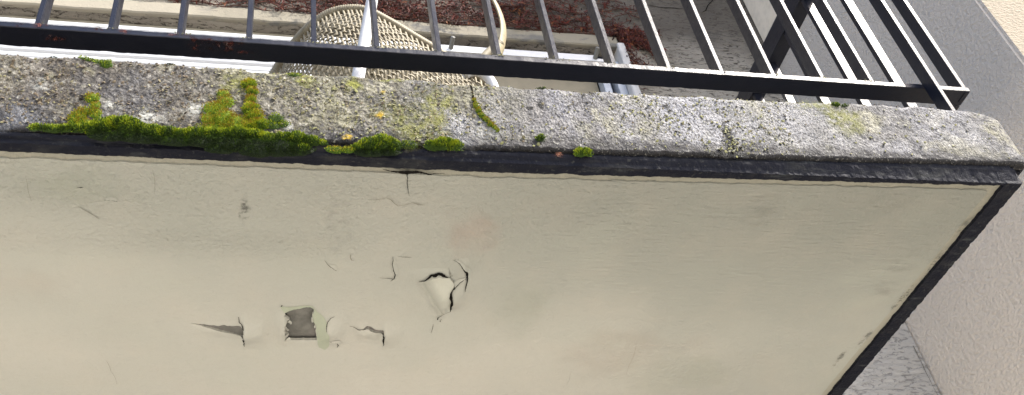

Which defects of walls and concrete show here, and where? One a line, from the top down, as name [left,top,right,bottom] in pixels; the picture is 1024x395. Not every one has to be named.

crack [376,169,443,206]
peeling [186,258,483,351]